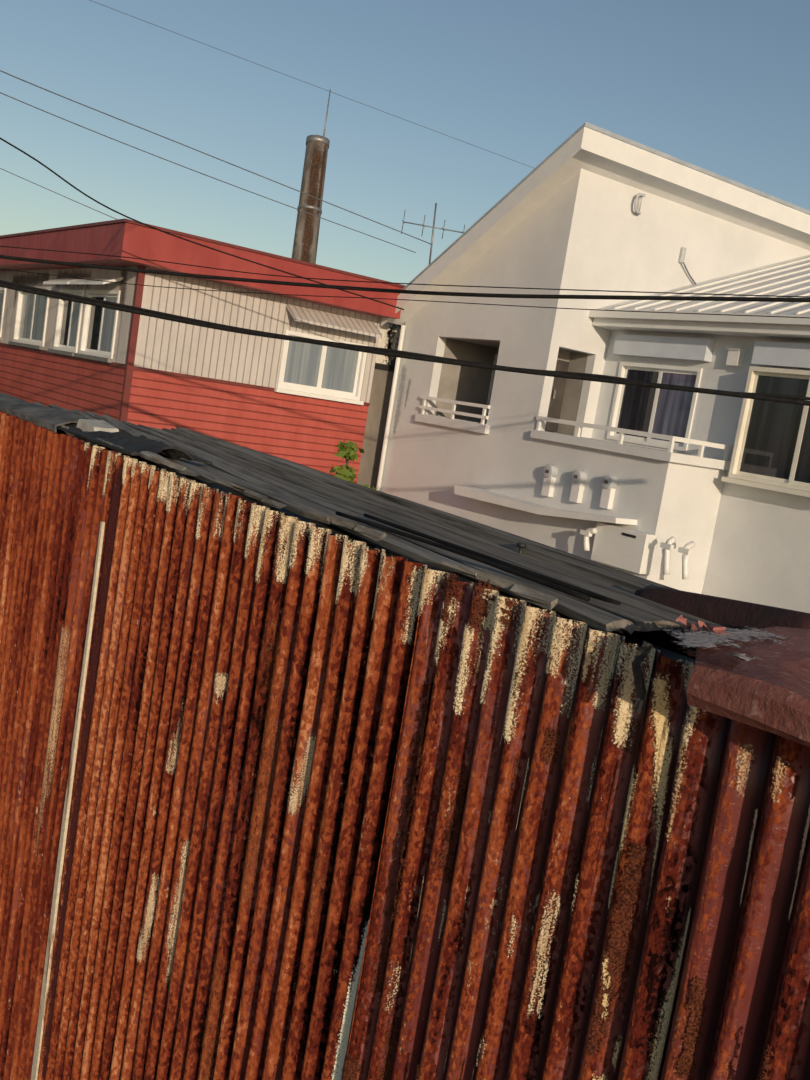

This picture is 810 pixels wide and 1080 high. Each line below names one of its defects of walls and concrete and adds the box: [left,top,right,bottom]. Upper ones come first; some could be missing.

peeling [84,442,393,619]
corrosion [441,573,520,631]
peeling [668,626,787,661]
corrosion [42,463,124,1079]
peeling [288,734,316,815]
corrosion [370,674,435,998]
corrosion [433,767,471,887]
peeling [400,565,706,913]
peeling [137,873,160,962]
peeling [165,838,190,992]
corrosion [585,826,650,1057]
corrosion [341,1019,400,1080]